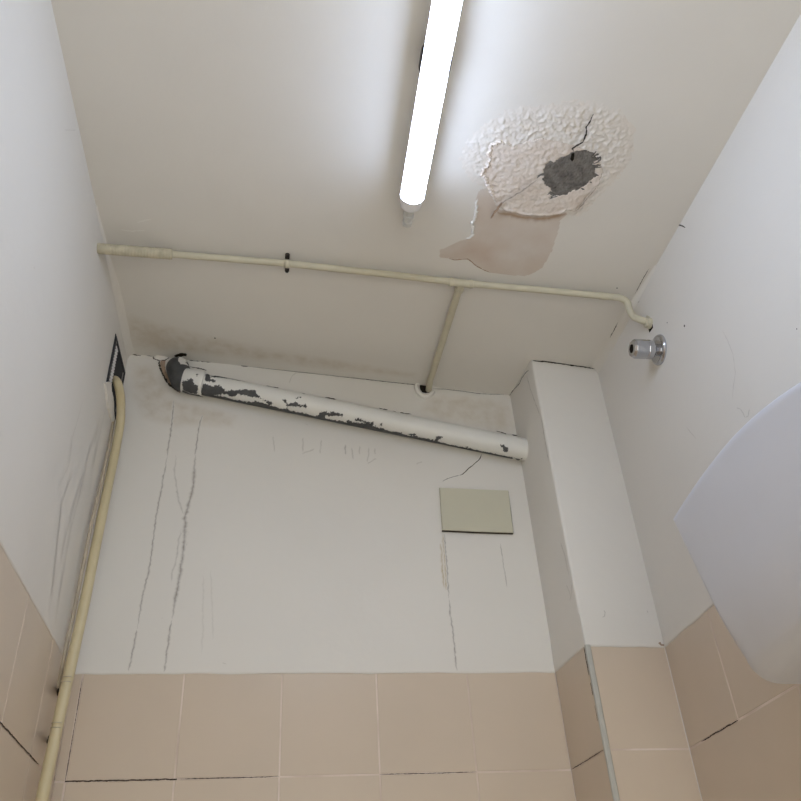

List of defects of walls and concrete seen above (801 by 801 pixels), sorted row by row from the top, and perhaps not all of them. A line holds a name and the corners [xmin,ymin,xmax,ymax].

spalling [439,99,636,276]
peeling [153,353,523,460]